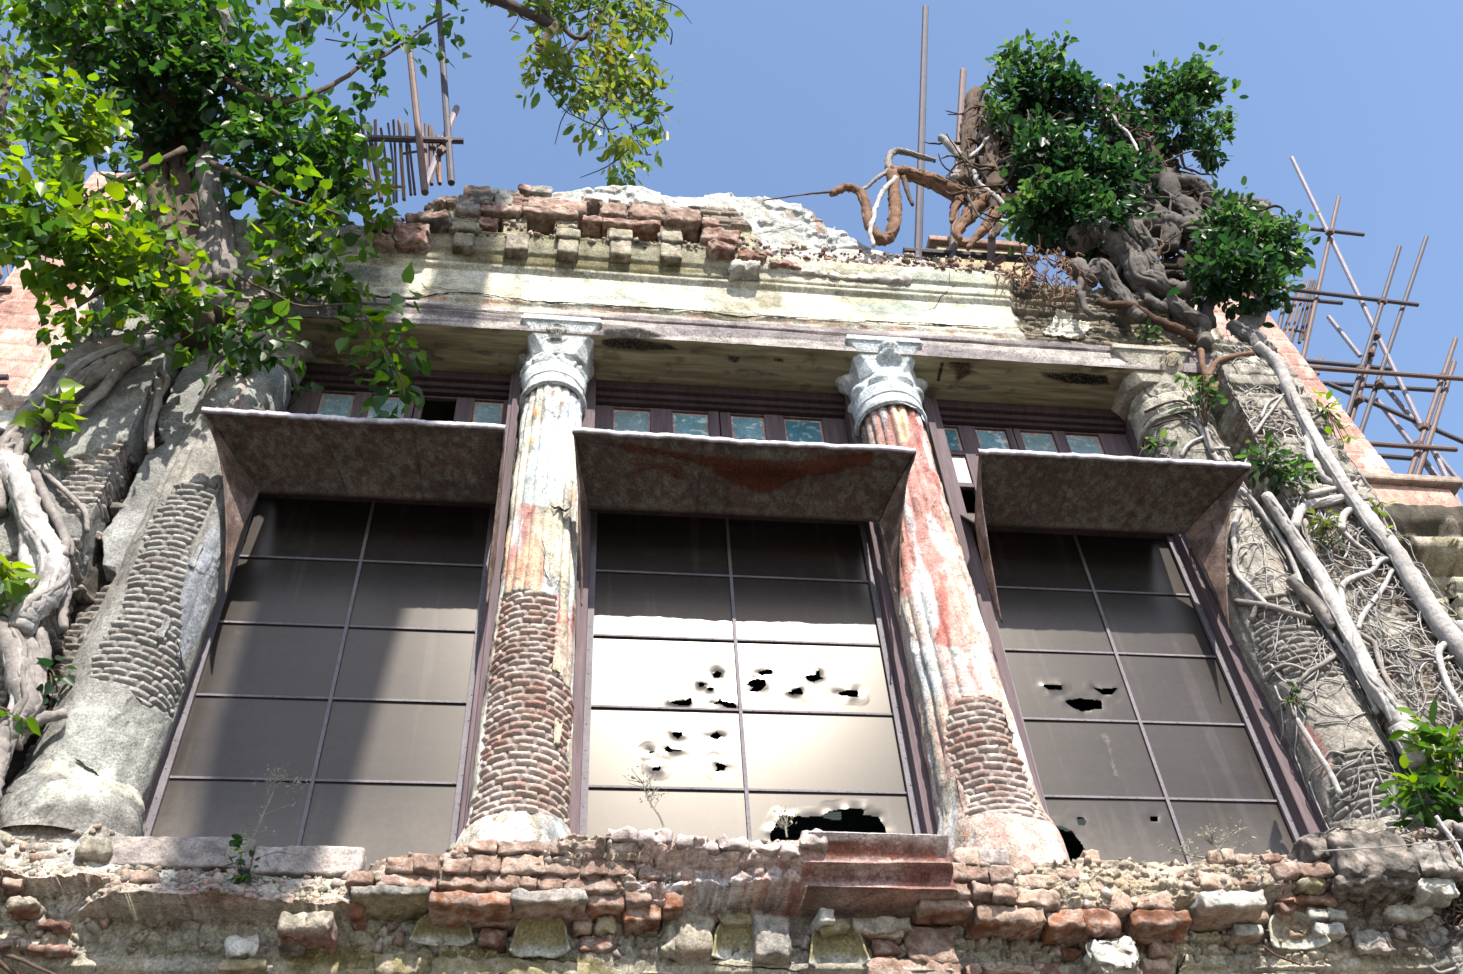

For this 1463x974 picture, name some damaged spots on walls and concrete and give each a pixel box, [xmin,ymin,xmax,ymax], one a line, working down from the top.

spalling [465,590,574,829]
spalling [944,696,1049,822]
crack [1175,954,1186,974]